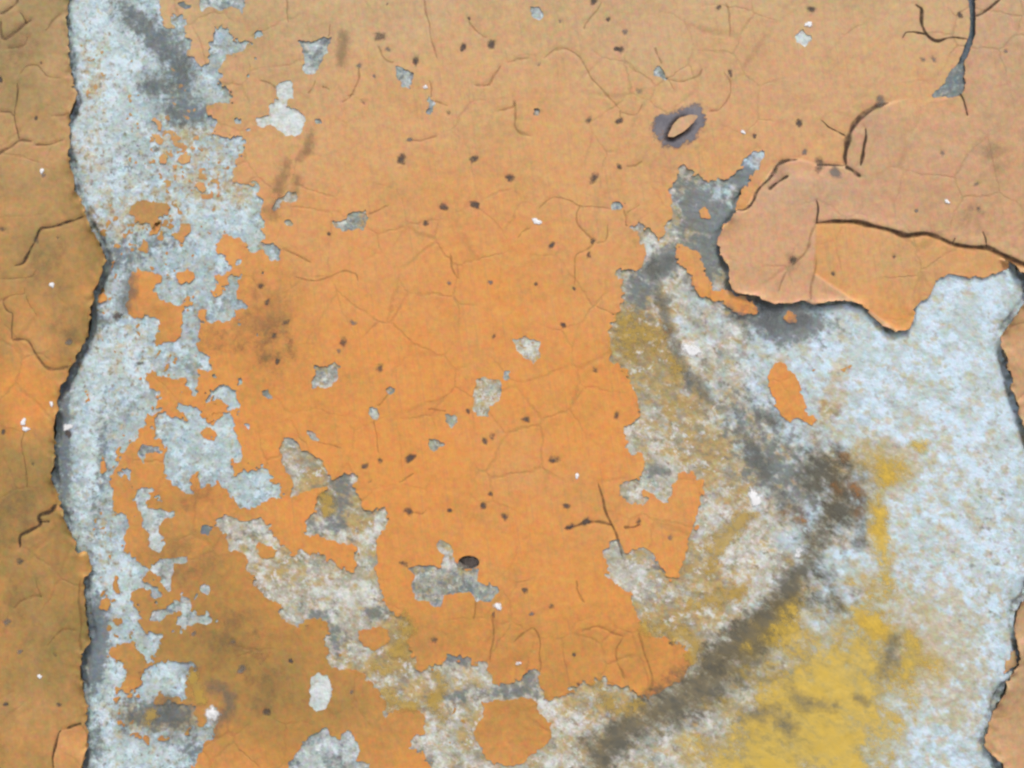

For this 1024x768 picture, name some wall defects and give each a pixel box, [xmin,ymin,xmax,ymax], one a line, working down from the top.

peeling [256,80,306,136]
peeling [298,37,332,74]
peeling [395,57,418,89]
peeling [932,64,965,98]
crack [902,0,1000,64]
crack [737,102,888,210]
crack [14,216,84,266]
crack [815,200,1024,266]
peeling [51,0,285,768]
peeling [201,150,1024,768]
crack [18,504,57,546]
leakage [582,447,869,768]